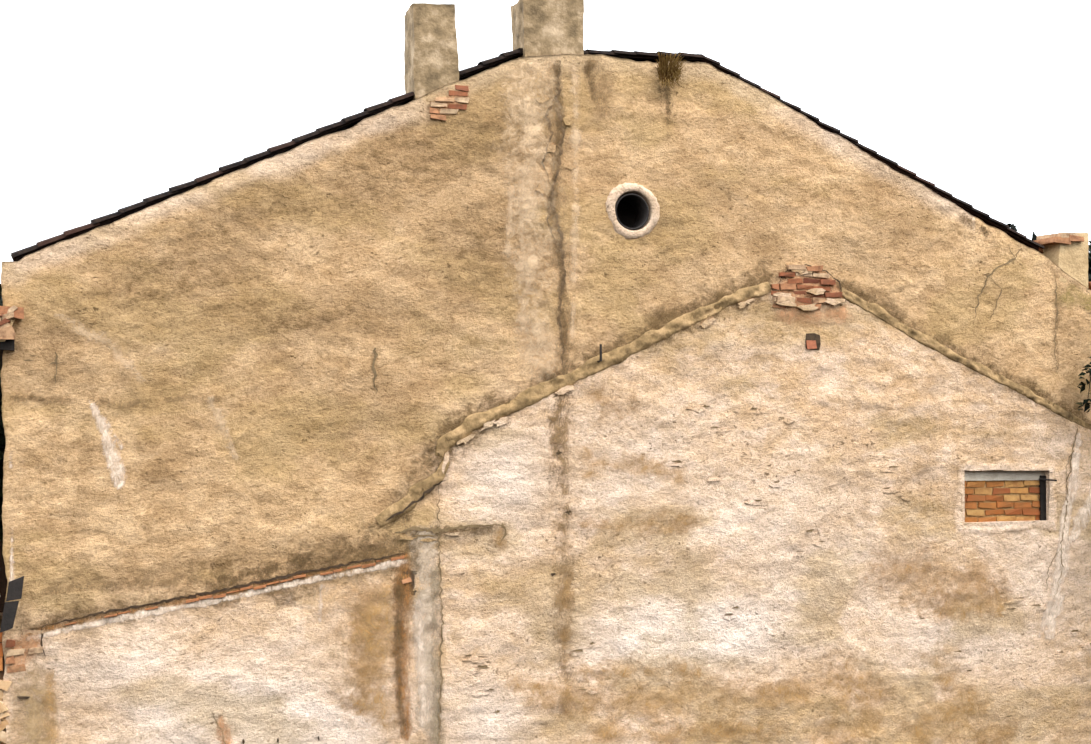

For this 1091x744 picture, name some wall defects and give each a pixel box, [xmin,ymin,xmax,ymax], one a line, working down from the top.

peeling [430,85,470,121]
peeling [771,264,847,322]
crack [973,247,1022,323]
spalling [805,333,821,350]
crack [32,480,507,744]
leakage [866,561,1004,620]
leakage [339,564,442,744]